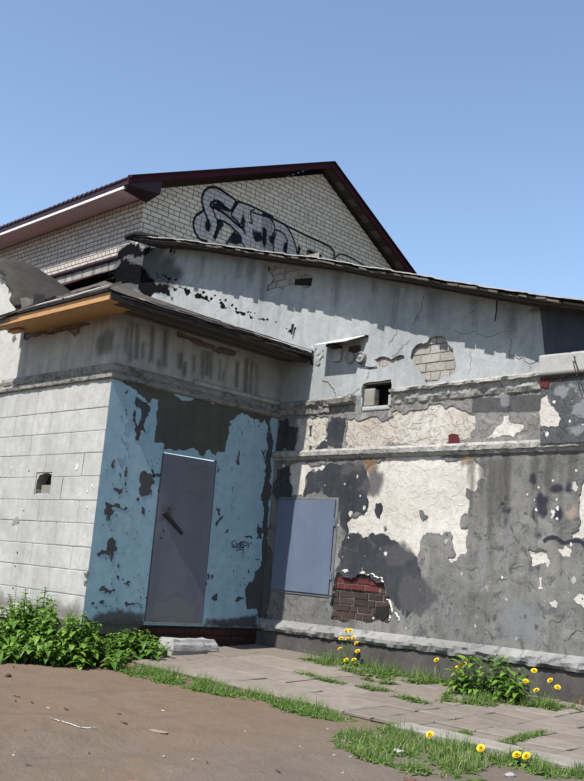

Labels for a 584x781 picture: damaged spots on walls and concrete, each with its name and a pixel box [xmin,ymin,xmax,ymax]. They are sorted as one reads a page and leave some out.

flaking render [268,266,313,291]
flaking render [376,336,456,383]
crack [454,307,539,374]
peeling [487,415,524,439]
peeling [539,374,584,437]
peeling [91,381,484,630]
peeling [558,482,584,557]
peeling [529,549,550,567]